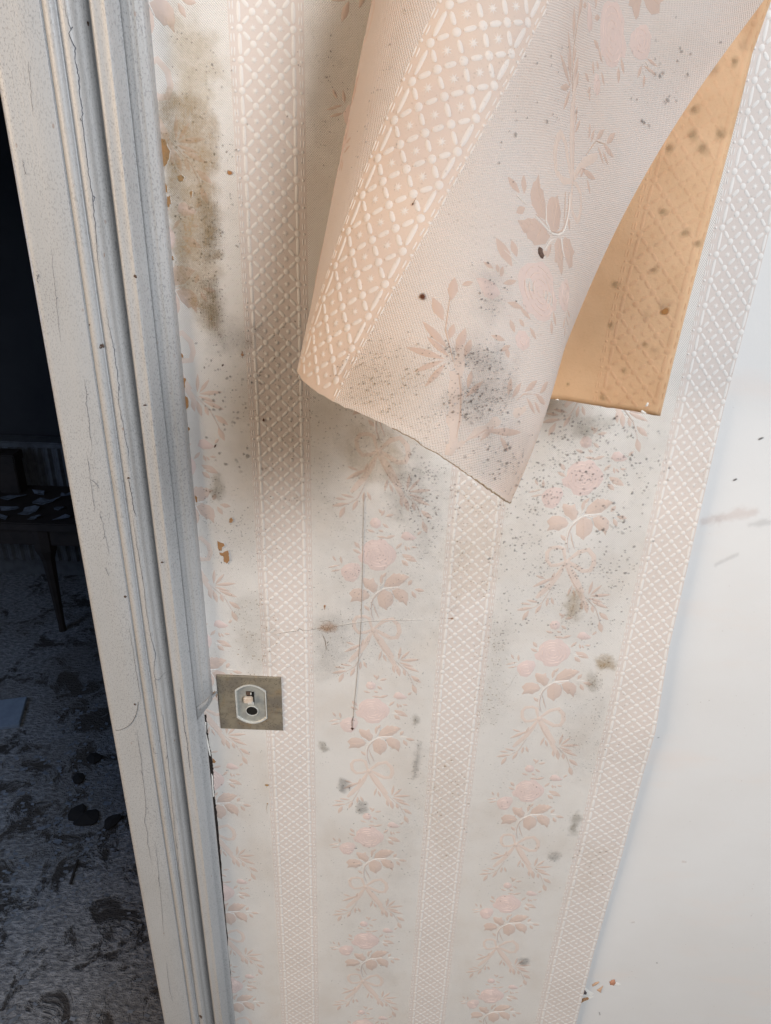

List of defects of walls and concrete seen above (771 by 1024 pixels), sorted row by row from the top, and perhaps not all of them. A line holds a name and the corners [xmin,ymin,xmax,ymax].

peeling [297,0,771,504]
peeling [217,541,230,564]